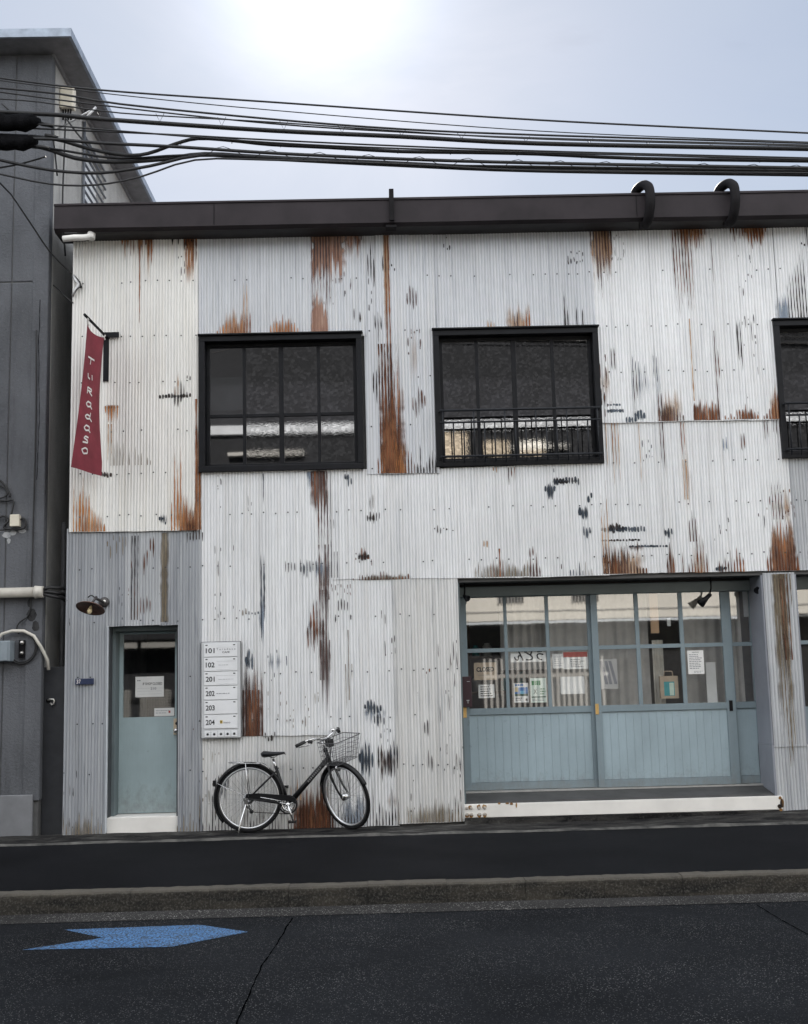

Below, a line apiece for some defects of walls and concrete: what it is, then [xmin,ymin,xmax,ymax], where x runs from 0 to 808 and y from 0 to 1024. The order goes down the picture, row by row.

corrosion [311,236,362,331]
corrosion [590,231,612,288]
corrosion [373,235,407,473]
corrosion [658,228,780,463]
corrosion [73,494,105,532]
corrosion [171,399,201,540]
corrosion [601,499,647,574]
corrosion [767,485,800,571]
corrosion [307,470,331,699]
corrosion [242,649,263,736]
corrosion [294,781,333,829]
crack [235,918,293,1024]